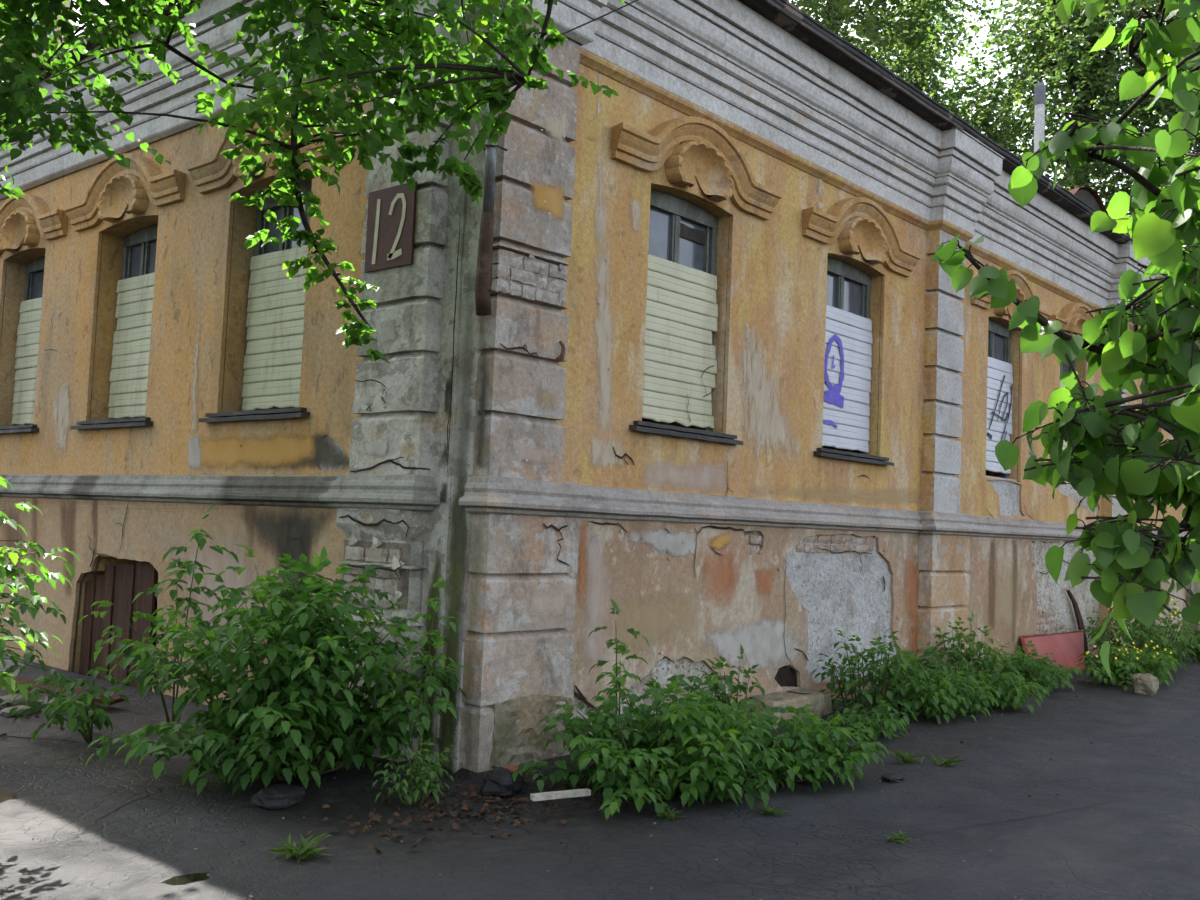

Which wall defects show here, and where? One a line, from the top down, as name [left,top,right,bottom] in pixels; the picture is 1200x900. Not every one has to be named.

peeling [540,114,566,141]
peeling [534,185,563,218]
spalling [491,249,568,307]
crack [350,214,461,472]
leakage [224,435,350,612]
crack [339,514,409,580]
crack [543,521,627,566]
peeling [620,528,696,560]
spalling [711,531,762,554]
spalling [774,534,900,687]
spalling [1030,541,1099,649]
spalling [490,650,729,770]